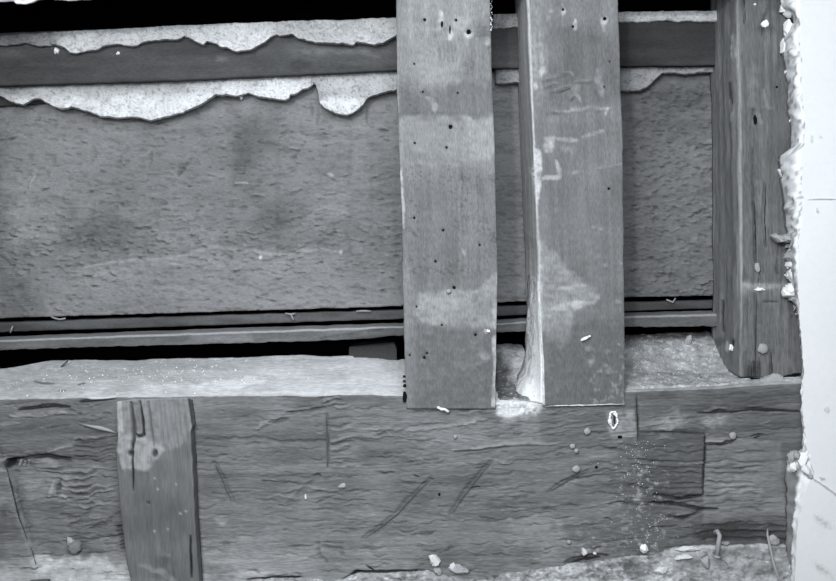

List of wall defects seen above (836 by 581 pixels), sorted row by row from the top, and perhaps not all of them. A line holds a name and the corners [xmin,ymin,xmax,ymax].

spalling [779,0,793,53]
crack [810,465,836,495]